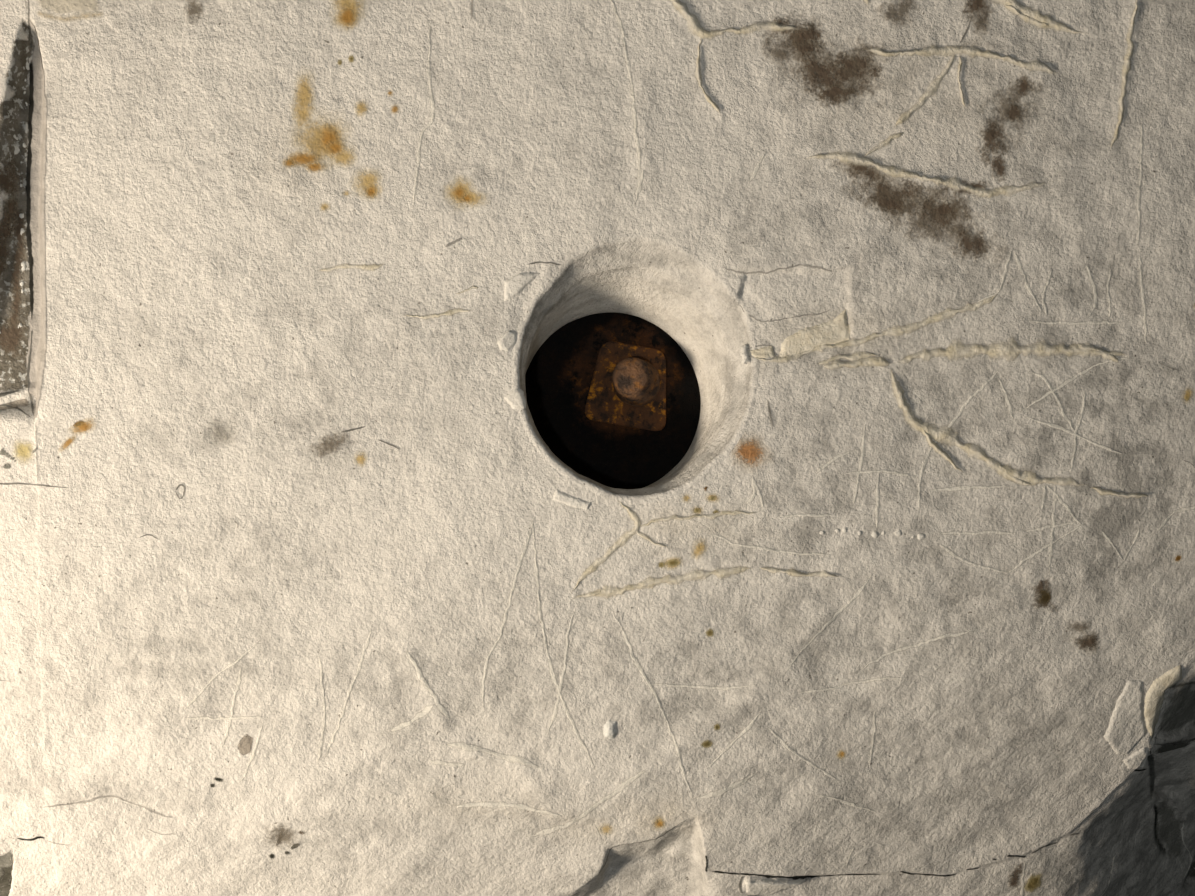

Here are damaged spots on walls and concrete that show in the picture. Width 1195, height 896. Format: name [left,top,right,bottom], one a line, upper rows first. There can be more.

rust [336,0,358,26]
damp [770,19,881,104]
rust [285,79,351,171]
damp [981,76,1040,176]
spalling [0,21,47,418]
rust [361,174,377,196]
damp [849,162,987,258]
peeling [1104,680,1149,769]
crack [705,834,1078,893]